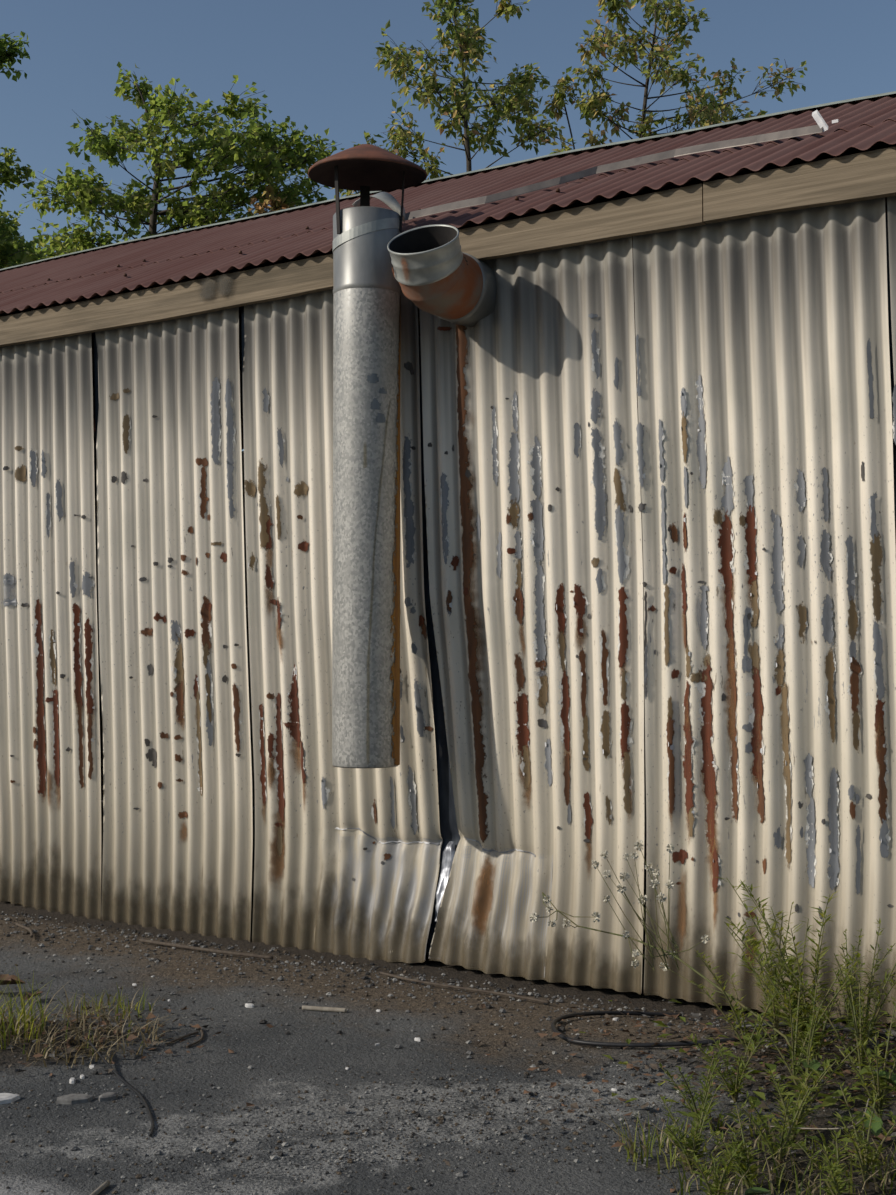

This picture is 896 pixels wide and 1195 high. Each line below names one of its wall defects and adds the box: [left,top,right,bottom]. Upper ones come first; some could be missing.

corrosion [33,599,60,803]
peeling [29,448,86,538]
corrosion [72,603,95,788]
spalling [139,555,197,581]
peeling [145,596,242,789]
corrosion [258,664,306,878]
corrosion [514,652,531,804]
peeling [491,391,560,786]
corrosion [554,583,593,870]
corrosion [671,645,756,968]
peeling [574,313,891,894]
damp [0,862,896,1025]